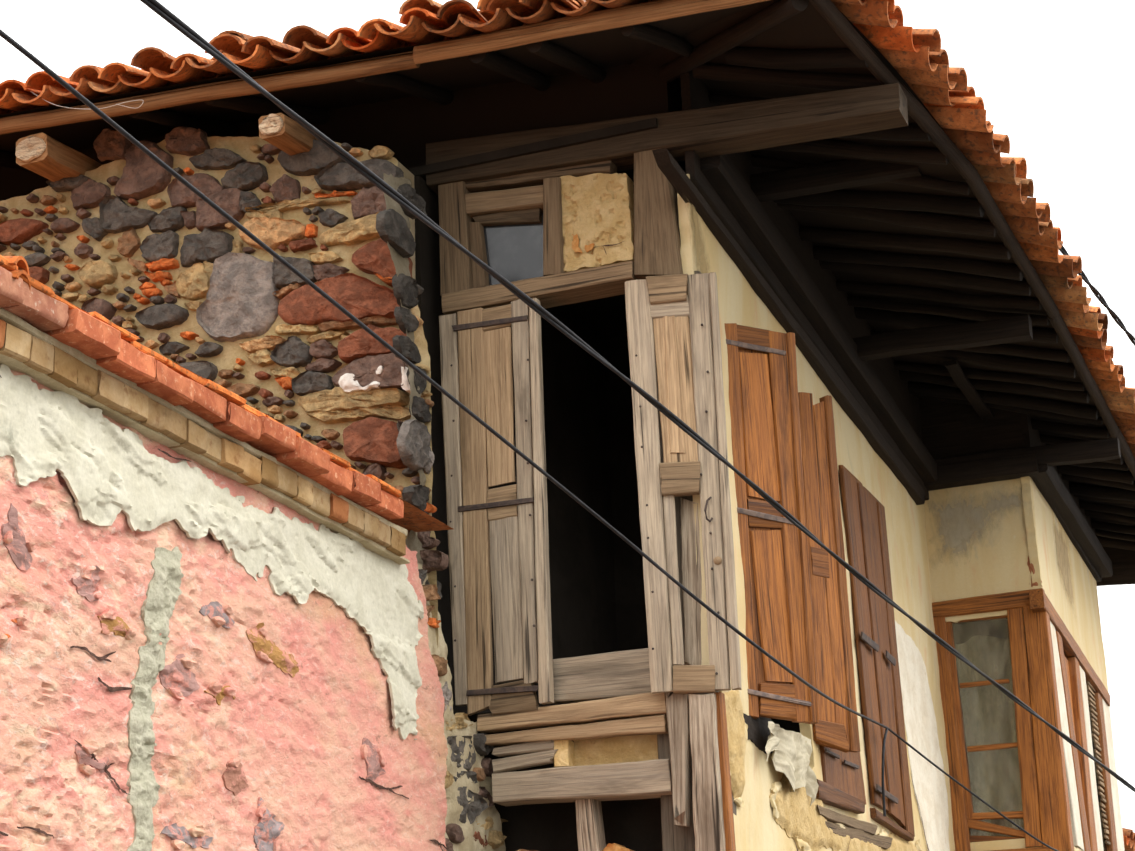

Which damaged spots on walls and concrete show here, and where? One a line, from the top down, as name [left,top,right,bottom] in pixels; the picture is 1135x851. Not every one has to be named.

peeling [1,503,36,571]
spalling [0,617,27,644]
peeling [70,565,137,640]
peeling [199,601,299,678]
water stain [126,546,184,851]
peeling [159,654,236,705]
peeling [74,743,111,776]
peeling [720,680,773,807]
peeling [222,756,285,851]
peeling [769,773,923,851]